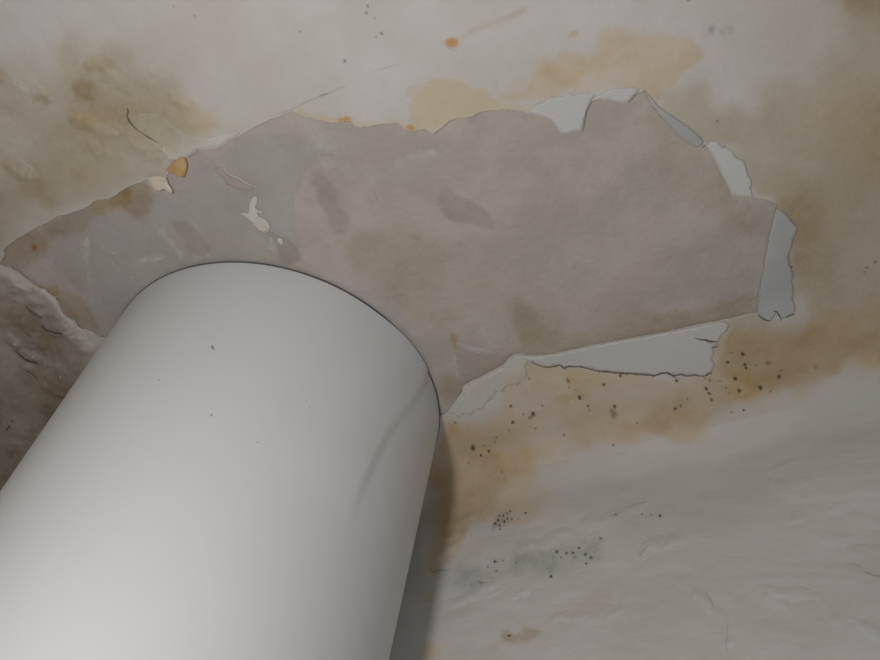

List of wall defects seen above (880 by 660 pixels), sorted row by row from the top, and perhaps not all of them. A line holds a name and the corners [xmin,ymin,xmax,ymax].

peeling [0,91,778,416]